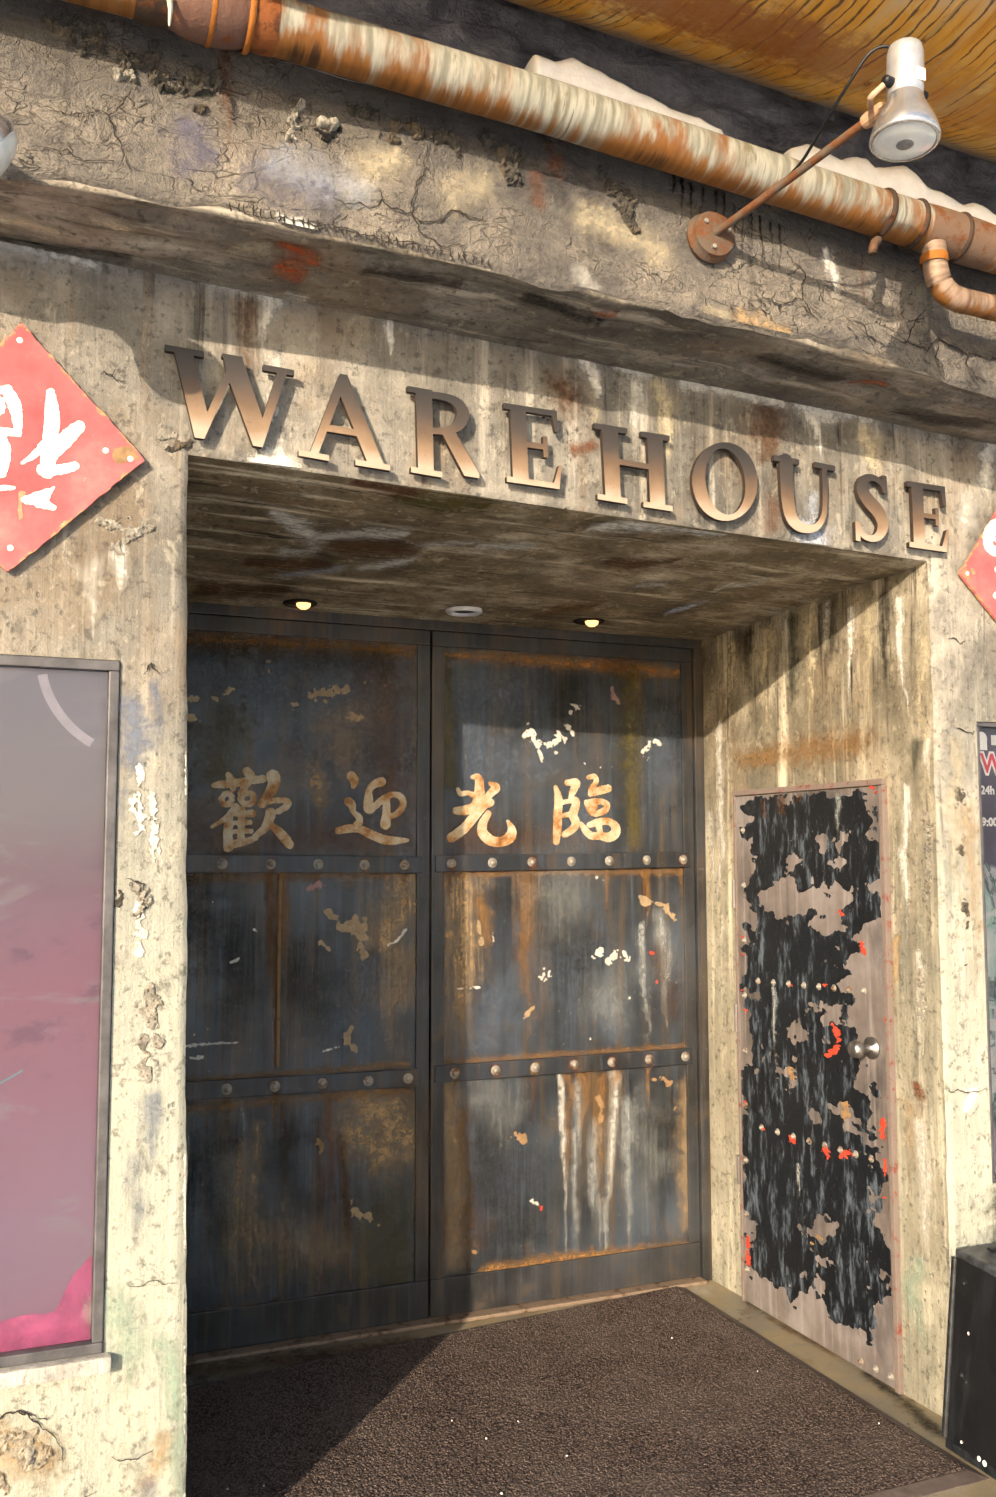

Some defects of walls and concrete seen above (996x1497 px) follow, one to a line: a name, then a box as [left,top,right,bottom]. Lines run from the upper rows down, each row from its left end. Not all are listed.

rust [133,0,168,29]
rust [249,0,282,57]
crack [32,87,132,169]
crack [226,146,491,267]
crack [748,257,996,386]
peeling [522,704,584,763]
peeling [641,739,662,757]
leakage [717,591,929,899]
rust [444,858,490,1019]
leakage [558,1071,631,1203]
rust [480,1242,689,1272]
spalling [0,1410,64,1496]